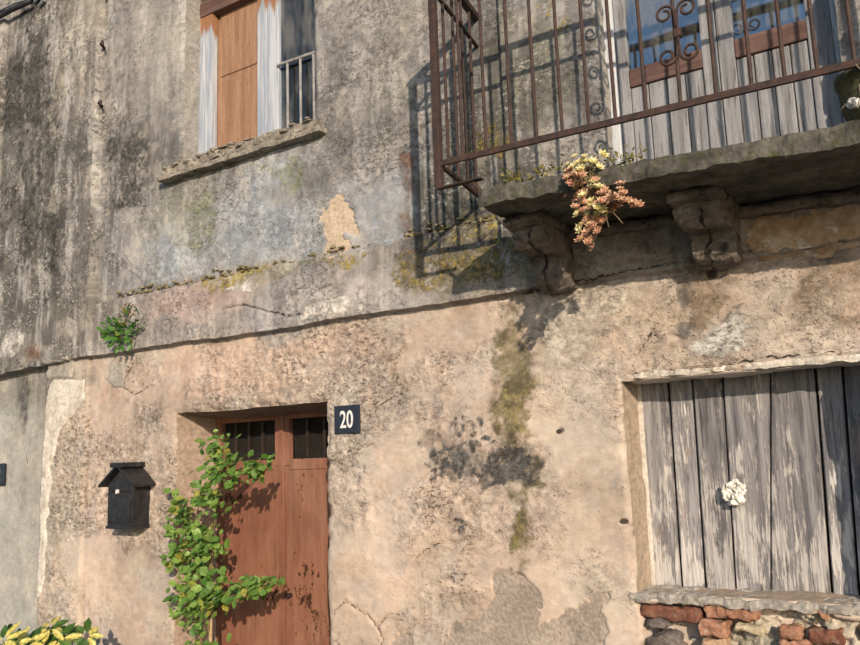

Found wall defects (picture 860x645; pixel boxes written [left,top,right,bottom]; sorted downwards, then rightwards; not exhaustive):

water stain [0,2,64,276]
water stain [107,129,150,209]
spalling [317,193,359,260]
water stain [414,192,512,252]
spalling [745,204,860,263]
mould [426,416,544,490]
spalling [443,568,611,645]